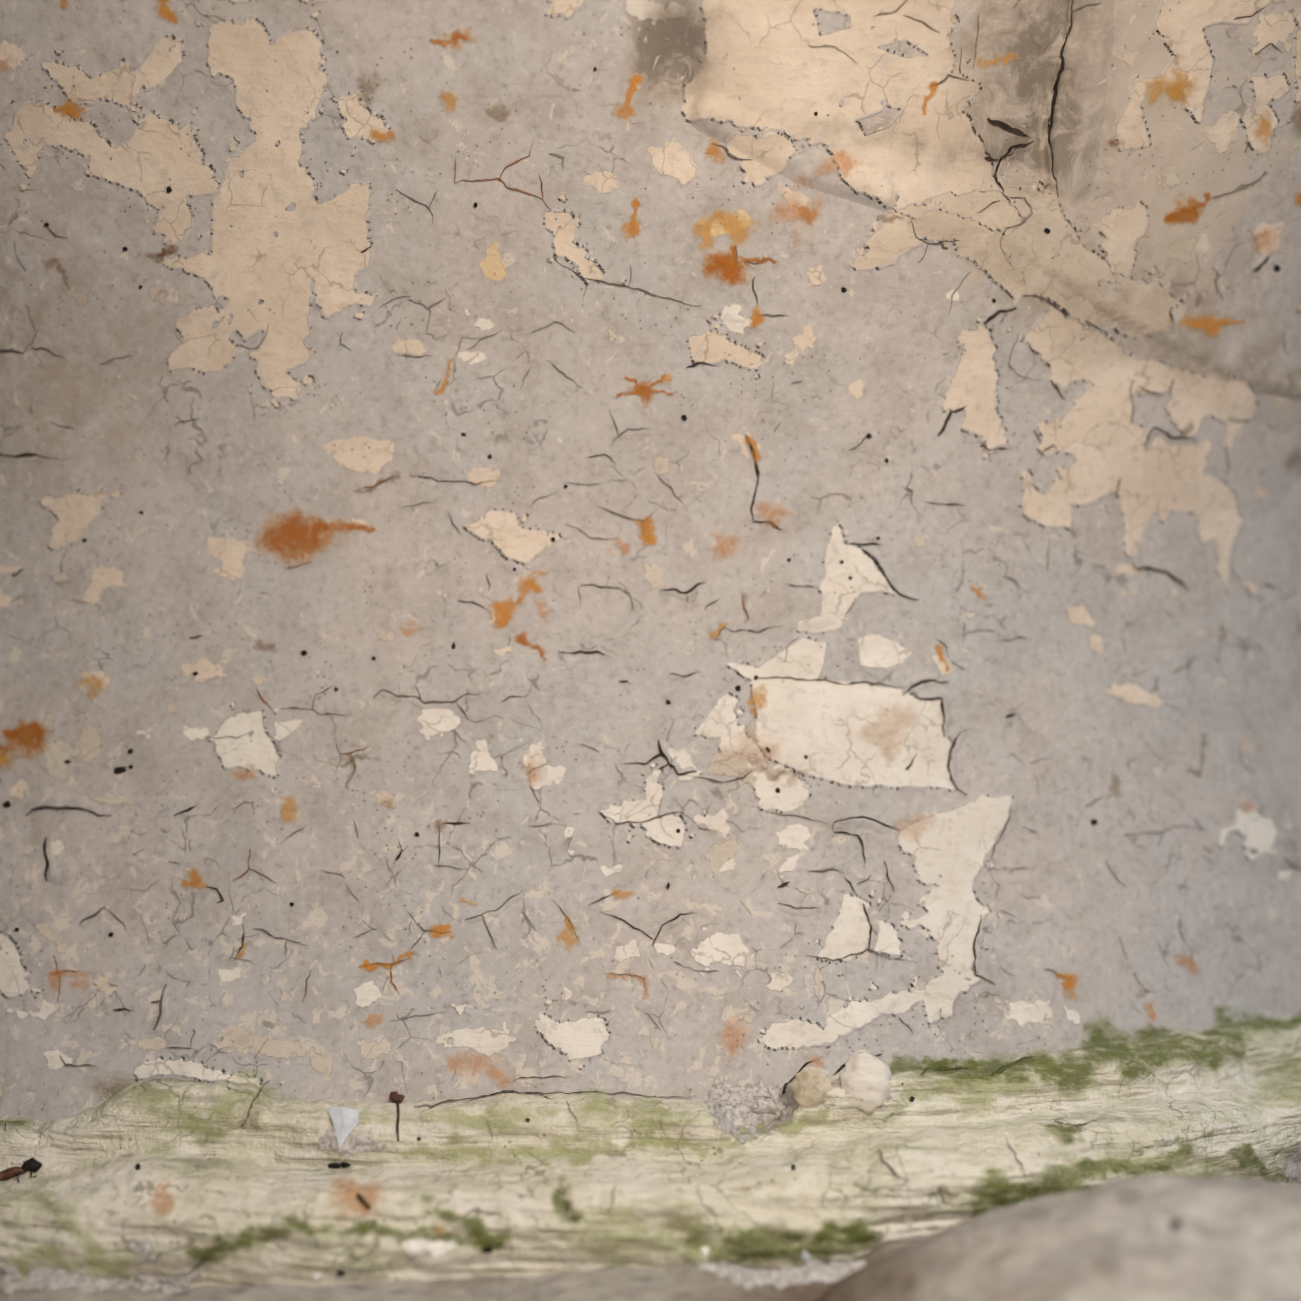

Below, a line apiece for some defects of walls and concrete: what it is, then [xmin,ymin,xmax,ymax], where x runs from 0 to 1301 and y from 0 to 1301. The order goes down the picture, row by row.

crack [874,0,979,85]
crack [980,0,1099,266]
peeling [0,0,391,408]
rust [694,211,777,285]
peeling [626,0,1259,594]
crack [745,381,801,530]
rust [262,512,375,559]
rust [0,721,46,768]
peeling [597,523,1027,1051]
leakage [892,1053,1062,1086]
leakage [971,1137,1193,1217]
leakage [686,1222,882,1264]